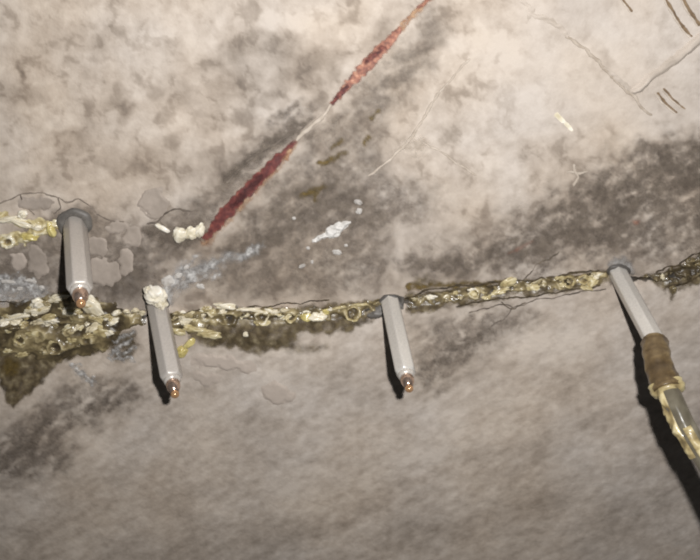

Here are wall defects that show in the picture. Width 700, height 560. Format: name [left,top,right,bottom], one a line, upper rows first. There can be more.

corrosion [331,0,430,105]
crack [0,192,124,222]
crack [147,208,191,226]
corrosion [202,141,296,245]
leakage [107,104,421,305]
leakage [406,141,700,313]
crack [228,299,329,320]
crack [404,251,609,327]
crack [631,252,700,288]
leakage [90,331,137,360]
leakage [0,352,117,407]